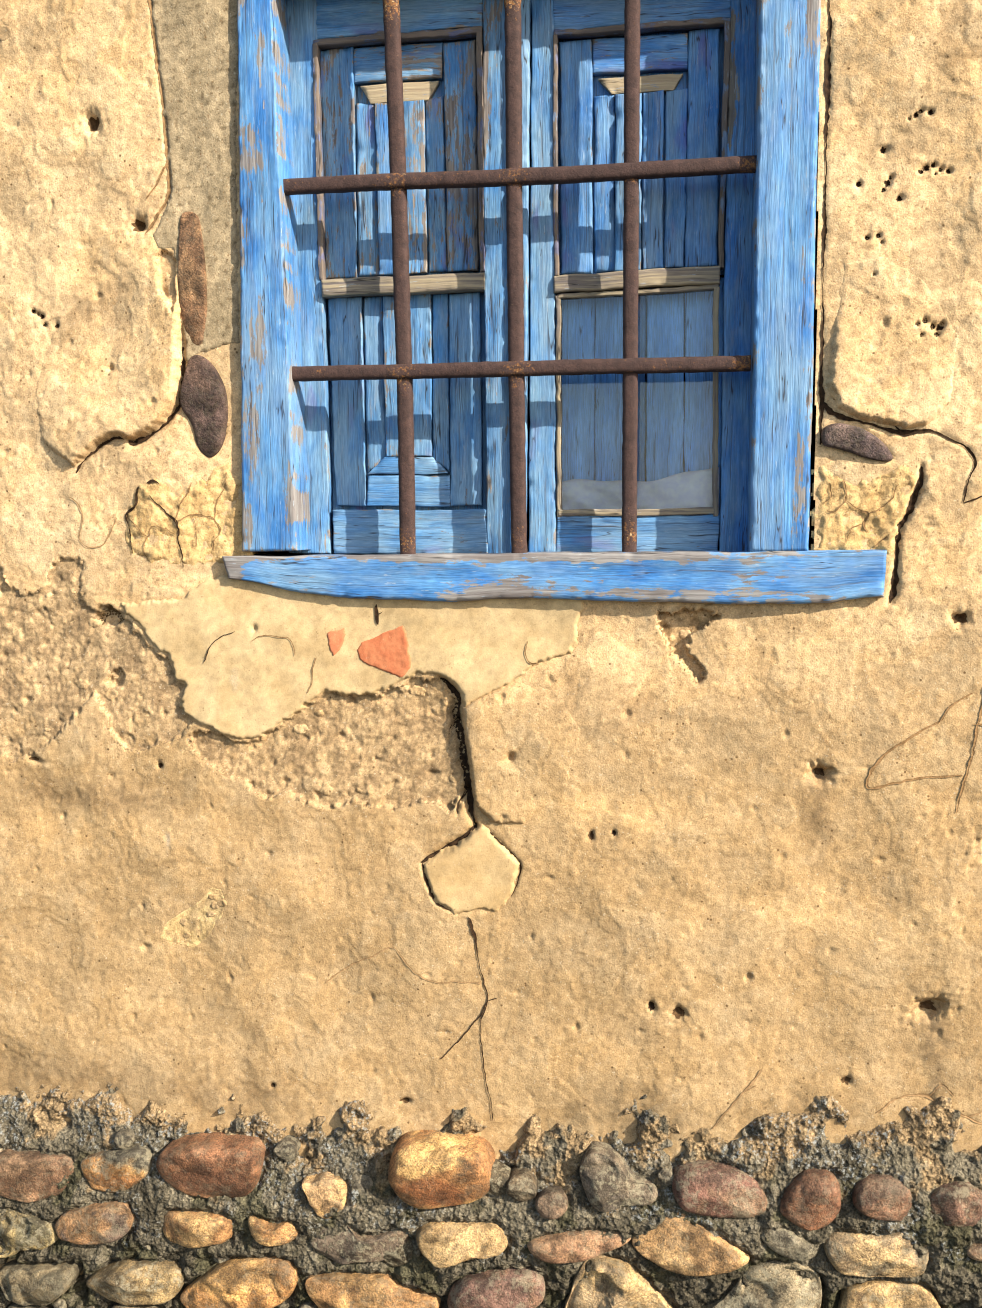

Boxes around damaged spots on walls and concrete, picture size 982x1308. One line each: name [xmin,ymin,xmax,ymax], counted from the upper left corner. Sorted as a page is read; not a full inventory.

crack [819,0,982,503]
crack [69,347,186,548]
crack [874,466,924,603]
flaking render [0,556,467,813]
crack [326,678,522,1120]